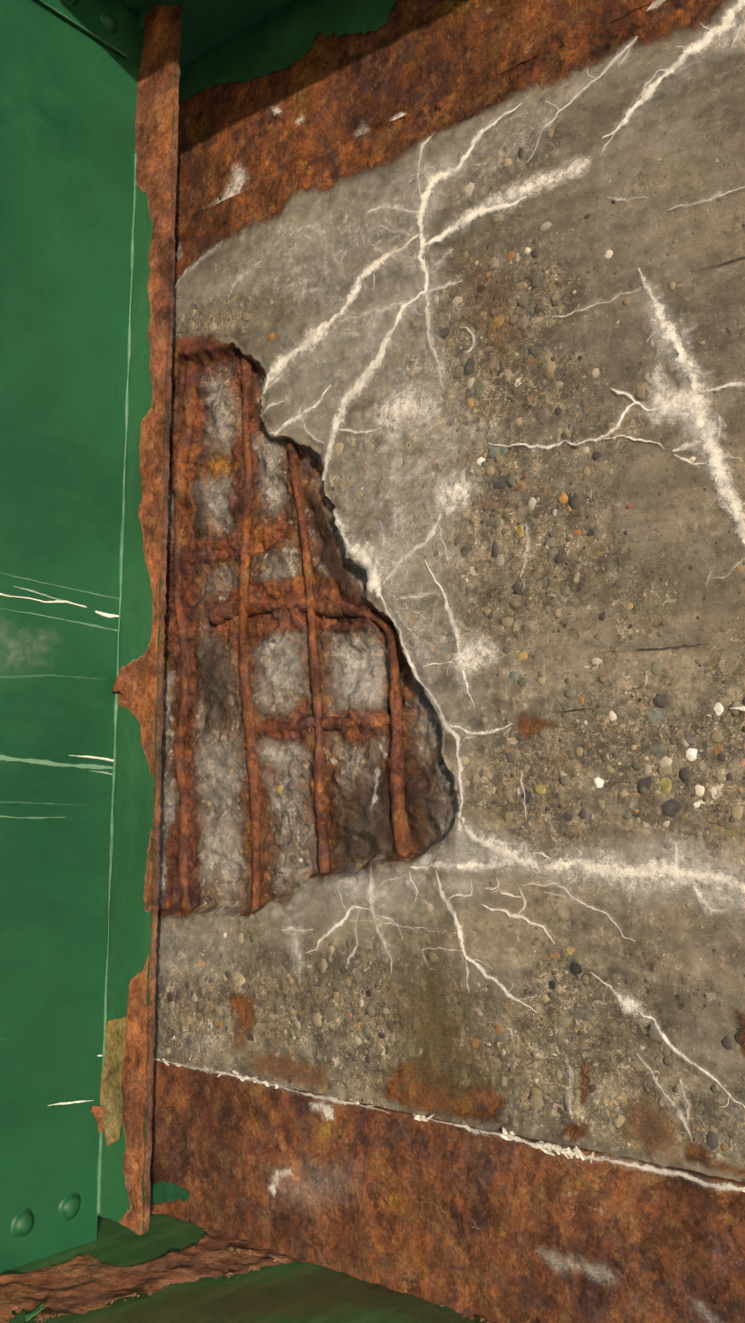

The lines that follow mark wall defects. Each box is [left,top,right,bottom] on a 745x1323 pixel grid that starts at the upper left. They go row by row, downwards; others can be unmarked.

crack [263,37,637,480]
spalling [463,137,524,230]
corrosion [112,0,723,918]
spalling [157,221,745,931]
crack [489,268,745,544]
crack [283,510,745,1012]
corrosion [90,954,162,1236]
damp [217,1070,286,1089]
damp [304,1093,388,1119]
spalling [154,932,604,1120]
corrosion [384,1061,504,1121]
damp [413,1114,745,1192]